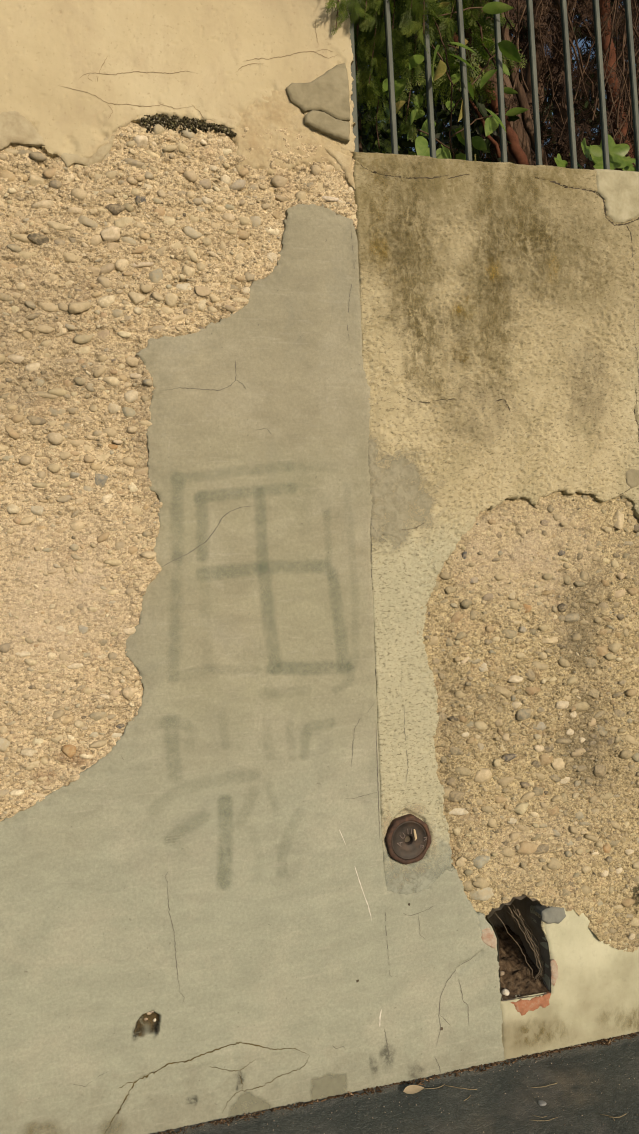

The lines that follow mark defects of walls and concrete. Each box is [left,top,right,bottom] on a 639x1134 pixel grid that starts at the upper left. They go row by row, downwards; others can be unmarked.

crack [58,58,204,119]
leakage [396,184,431,337]
leakage [477,171,548,291]
crack [535,177,639,442]
spalling [0,63,358,821]
spalling [417,469,639,952]
crack [69,1042,344,1134]